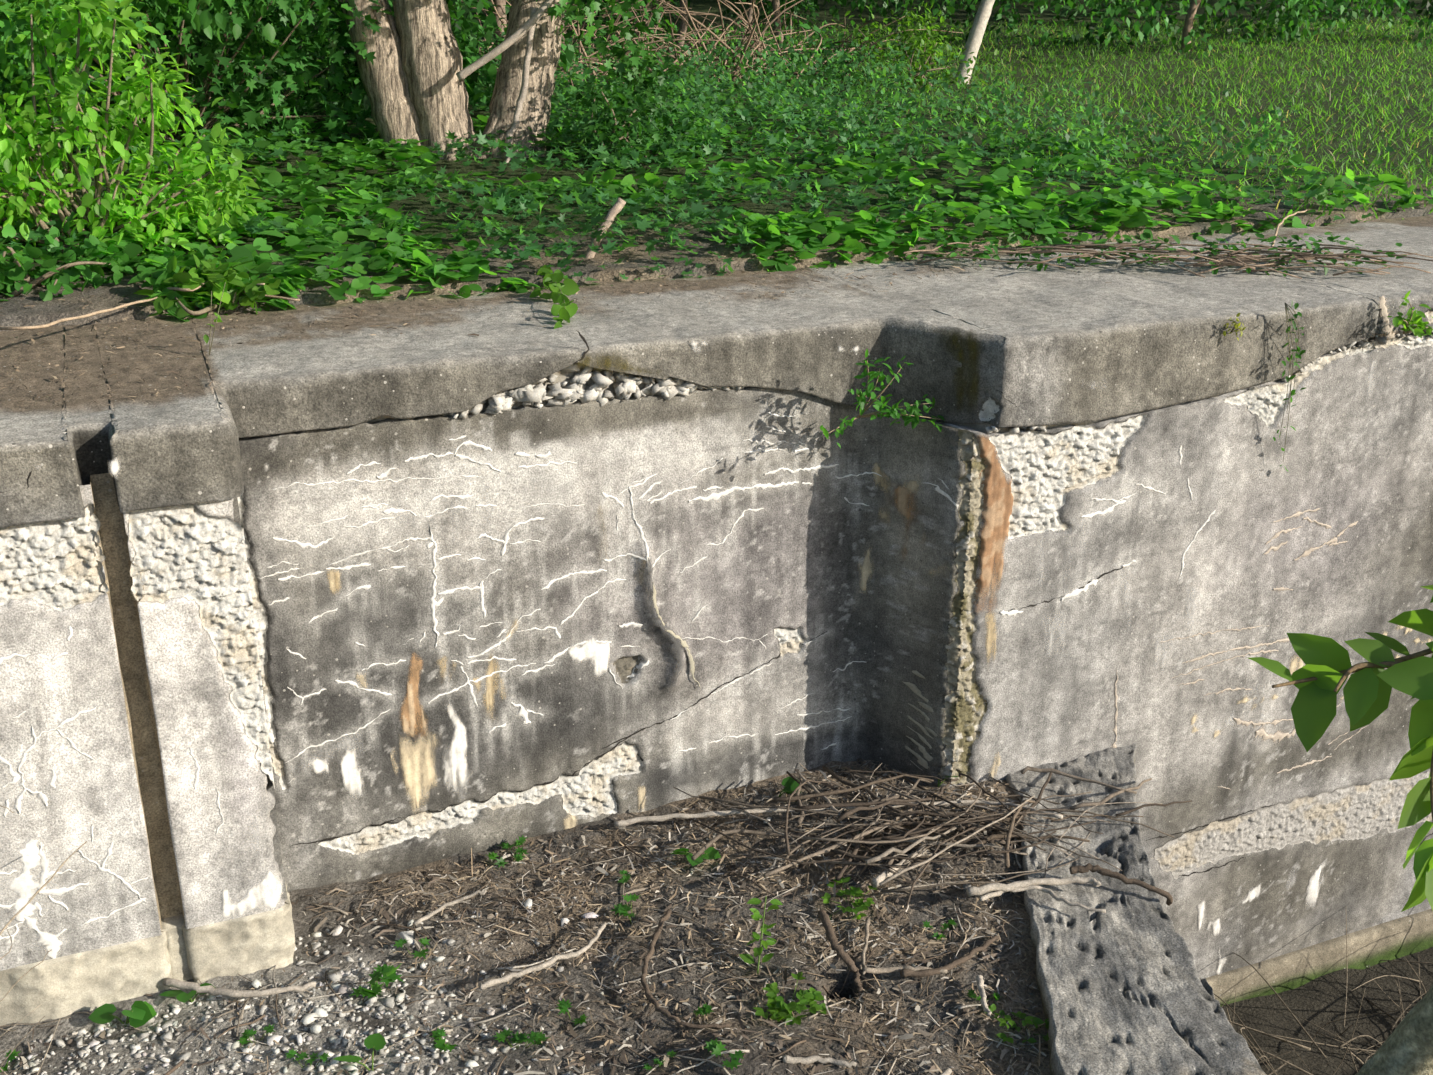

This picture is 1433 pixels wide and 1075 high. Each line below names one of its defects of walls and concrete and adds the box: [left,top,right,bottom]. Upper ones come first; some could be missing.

spalling [449,362,744,420]
spalling [0,505,109,613]
crack [0,705,148,959]
spalling [128,494,288,790]
damp [312,750,362,795]
rust [401,654,435,808]
damp [512,702,544,724]
crack [292,631,828,846]
crack [257,412,881,783]
damp [564,815,576,830]
rust [974,436,1014,656]
spalling [901,396,1148,785]